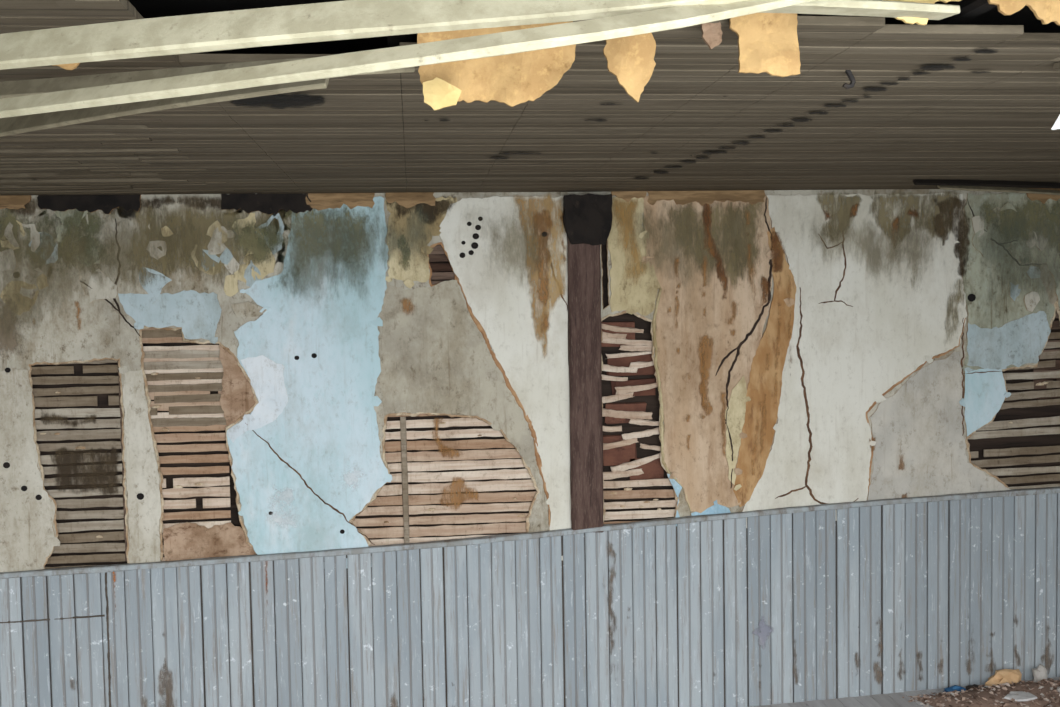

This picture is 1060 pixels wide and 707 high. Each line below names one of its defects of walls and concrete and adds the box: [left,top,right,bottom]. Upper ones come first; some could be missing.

damp [230,94,325,109]
damp [0,205,371,352]
peeling [0,196,571,572]
crack [715,198,773,488]
crack [775,232,858,504]
peeling [600,192,1060,528]
damp [818,192,970,331]
damp [983,200,1060,291]